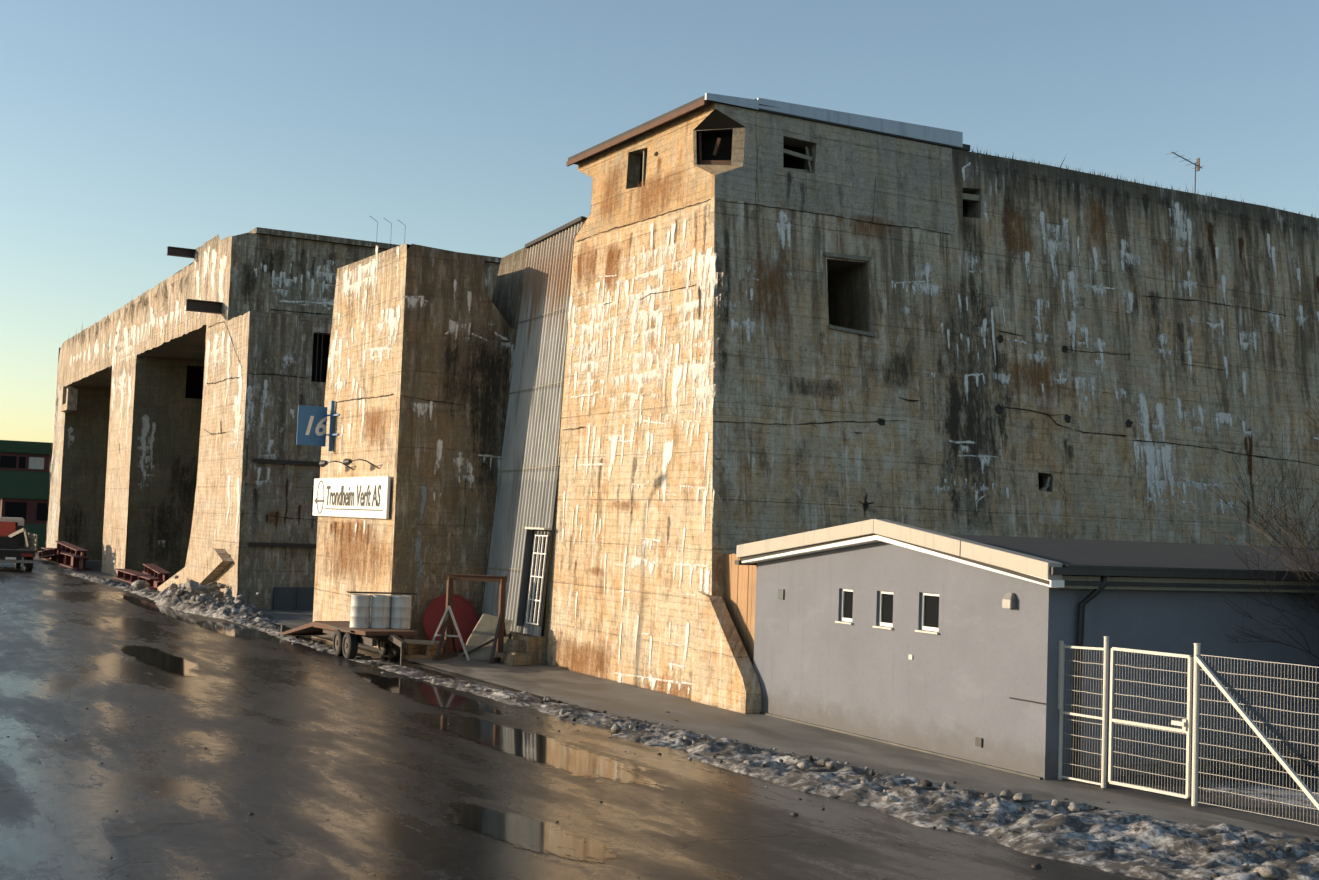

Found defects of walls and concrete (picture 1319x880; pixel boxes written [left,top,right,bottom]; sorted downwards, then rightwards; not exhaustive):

leakage [146,461,197,560]
leakage [70,246,276,541]
leakage [244,246,427,447]
corrosion [327,520,382,575]
corrosion [364,410,385,440]
leakage [412,279,515,488]
leakage [561,207,759,694]
leakage [891,262,939,315]
leakage [931,168,1319,522]